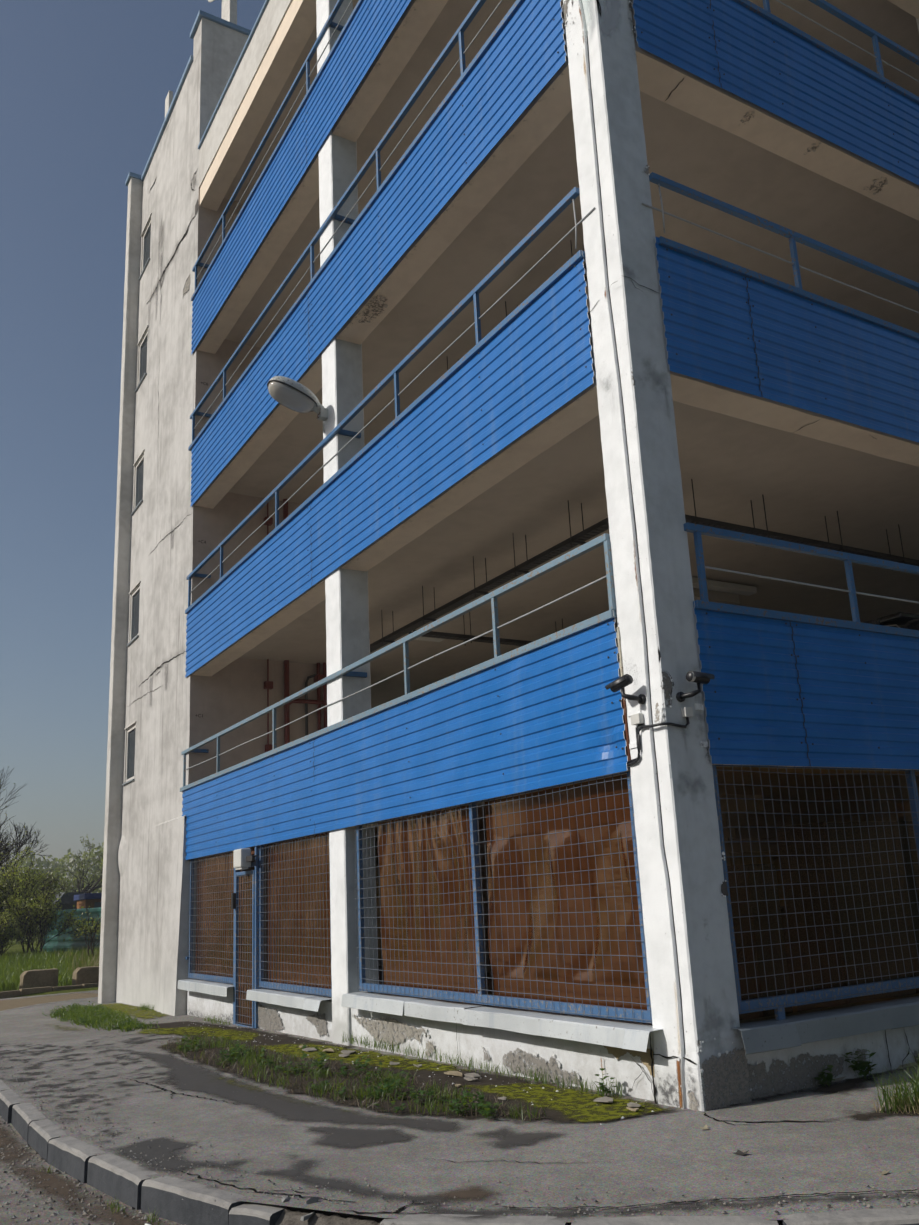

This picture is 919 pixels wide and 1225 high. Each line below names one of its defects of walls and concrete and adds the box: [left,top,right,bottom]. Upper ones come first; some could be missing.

crack [147,170,197,303]
crack [127,651,185,707]
peeling [258,1002,283,1031]
peeling [306,1012,328,1037]
peeling [352,1013,434,1057]
peeling [481,1046,580,1086]
peeling [603,1045,655,1077]
crack [632,1033,696,1104]
peeling [687,1036,867,1111]
crack [178,1170,431,1214]
spalling [300,1196,319,1221]
crack [503,1189,918,1209]